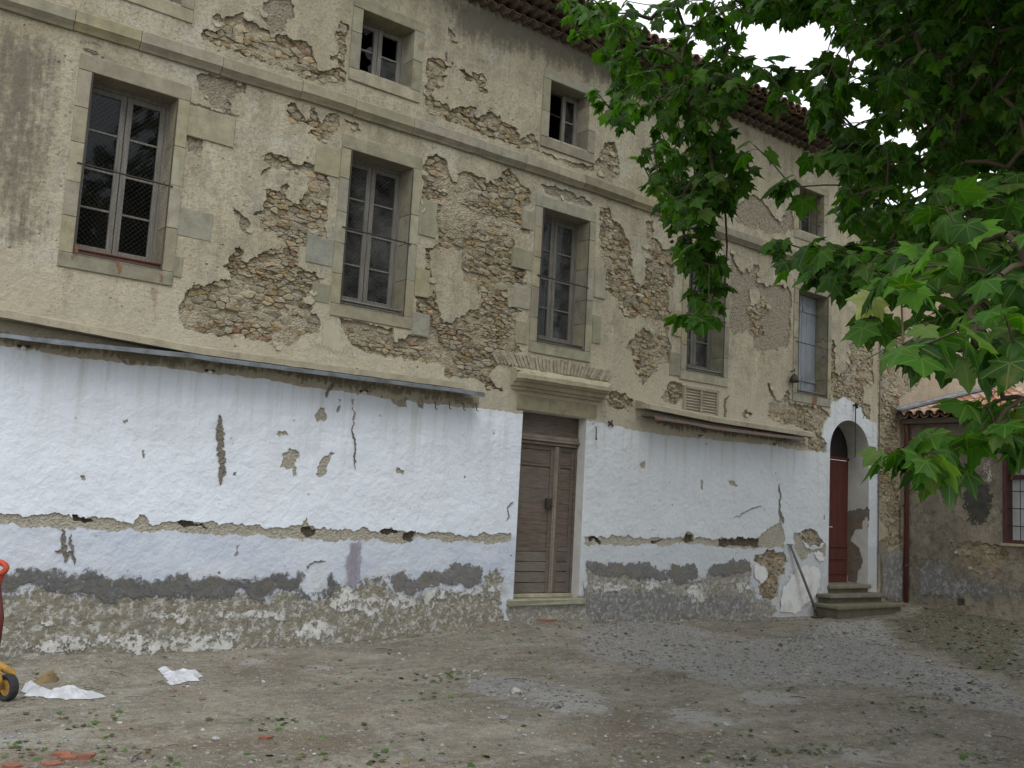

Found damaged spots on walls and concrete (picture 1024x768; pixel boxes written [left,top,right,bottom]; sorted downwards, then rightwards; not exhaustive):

flaking render [201,0,348,85]
flaking render [178,152,330,350]
flaking render [339,154,674,391]
flaking render [729,250,791,353]
crack [350,420,358,467]
flaking render [0,512,511,557]
crack [734,483,784,524]
flaking render [0,523,826,661]